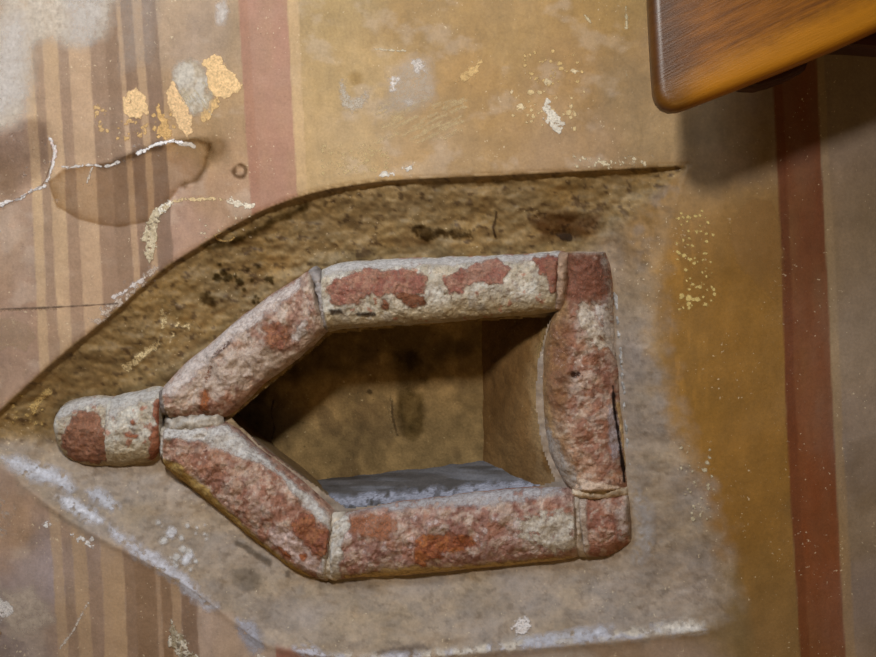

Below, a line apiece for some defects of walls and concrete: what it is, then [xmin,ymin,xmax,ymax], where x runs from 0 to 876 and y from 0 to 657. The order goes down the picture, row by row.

peeling [94,54,242,140]
peeling [510,49,585,134]
crack [0,137,196,207]
peeling [141,196,256,263]
crack [611,385,626,482]